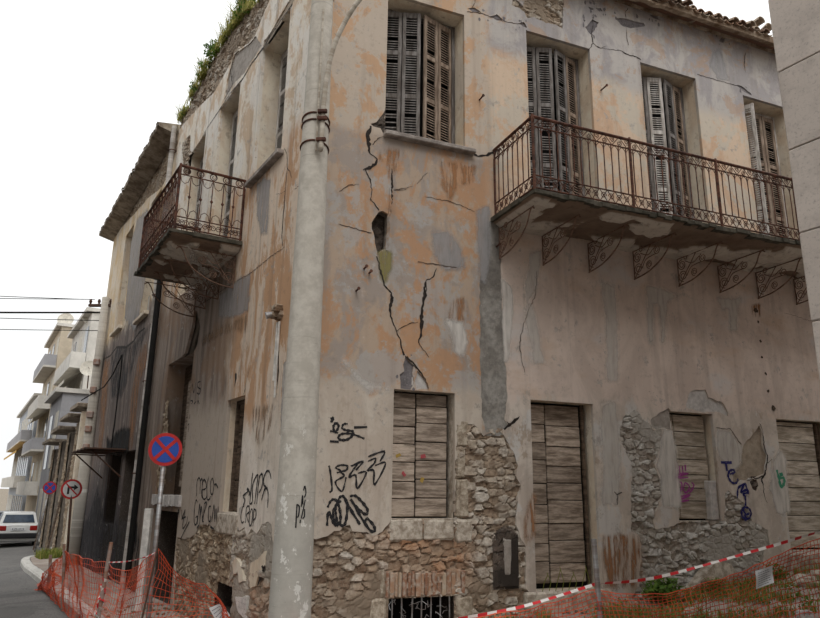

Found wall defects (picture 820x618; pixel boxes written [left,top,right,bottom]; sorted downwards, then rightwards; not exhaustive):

flaking render [226,0,294,95]
crack [588,8,641,60]
leakage [257,178,270,233]
crack [340,126,471,210]
crack [376,256,457,389]
peeling [479,221,507,436]
crack [519,272,537,372]
flaking render [732,428,766,491]
peeling [232,551,267,618]